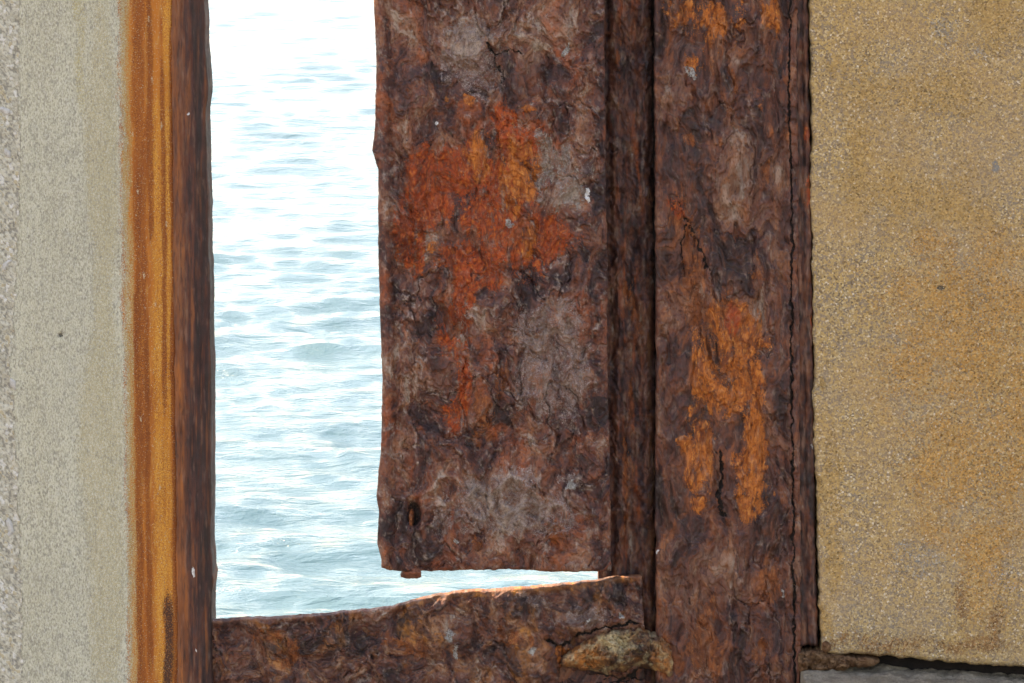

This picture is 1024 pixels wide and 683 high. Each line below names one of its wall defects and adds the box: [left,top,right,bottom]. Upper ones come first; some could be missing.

rust [663,0,747,78]
rust [758,0,782,37]
rust [389,92,585,450]
rust [115,0,178,683]
rust [667,194,775,526]
rust [432,463,589,552]
crack [715,450,727,517]
rust [400,568,421,579]